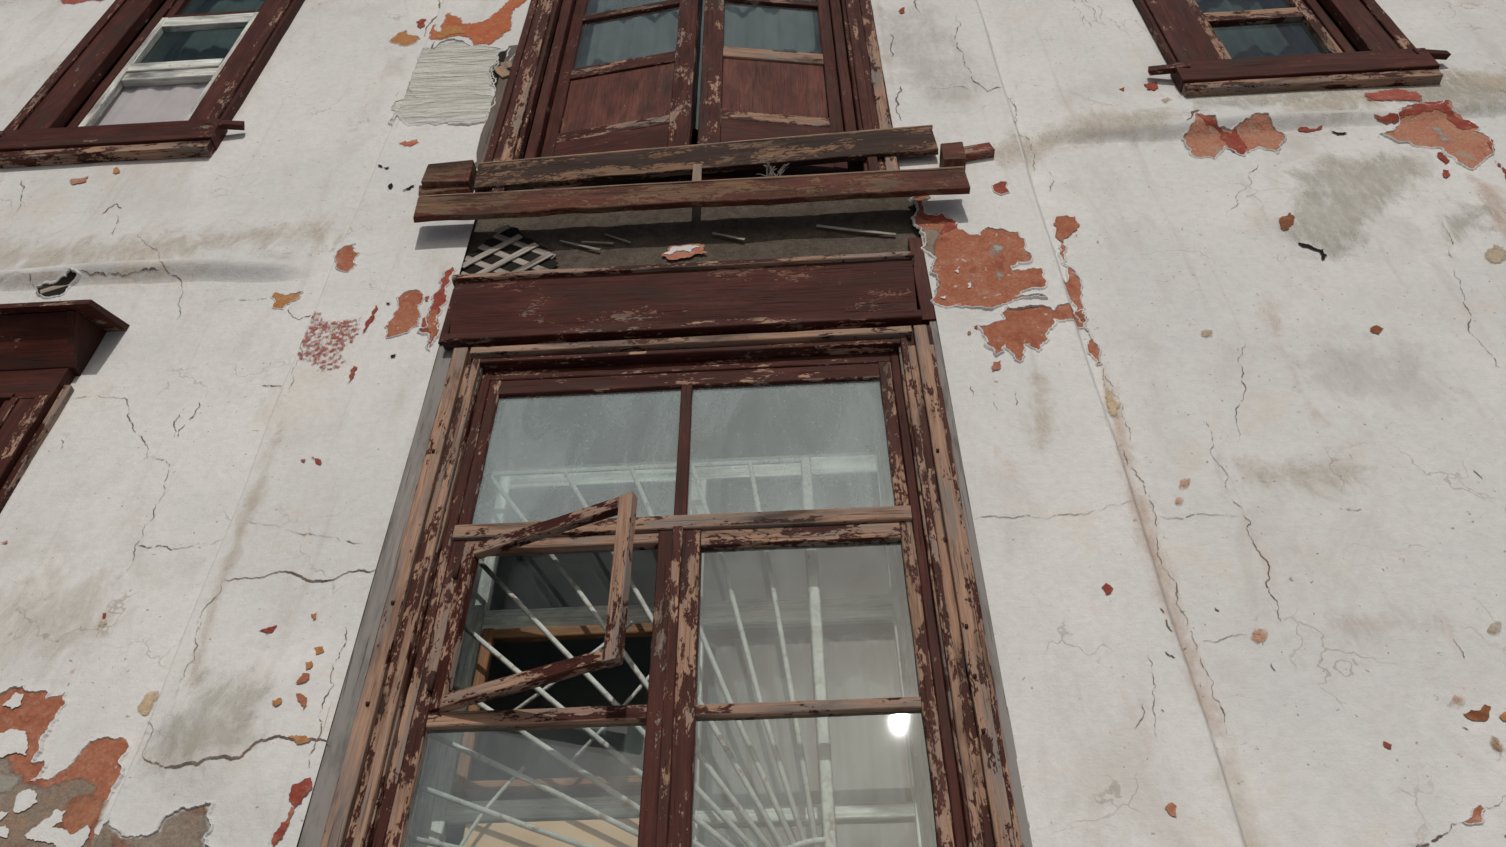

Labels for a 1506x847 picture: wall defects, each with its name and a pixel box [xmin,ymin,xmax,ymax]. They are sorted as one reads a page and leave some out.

peeling [389,0,526,93]
peeling [1180,89,1346,160]
peeling [1279,82,1506,260]
peeling [297,266,456,382]
peeling [908,195,1121,417]
crack [1442,225,1498,367]
crack [77,395,377,682]
crack [969,344,1281,722]
peeling [0,685,216,847]
crack [143,630,347,768]
crack [1136,660,1157,737]
crack [1416,796,1503,847]